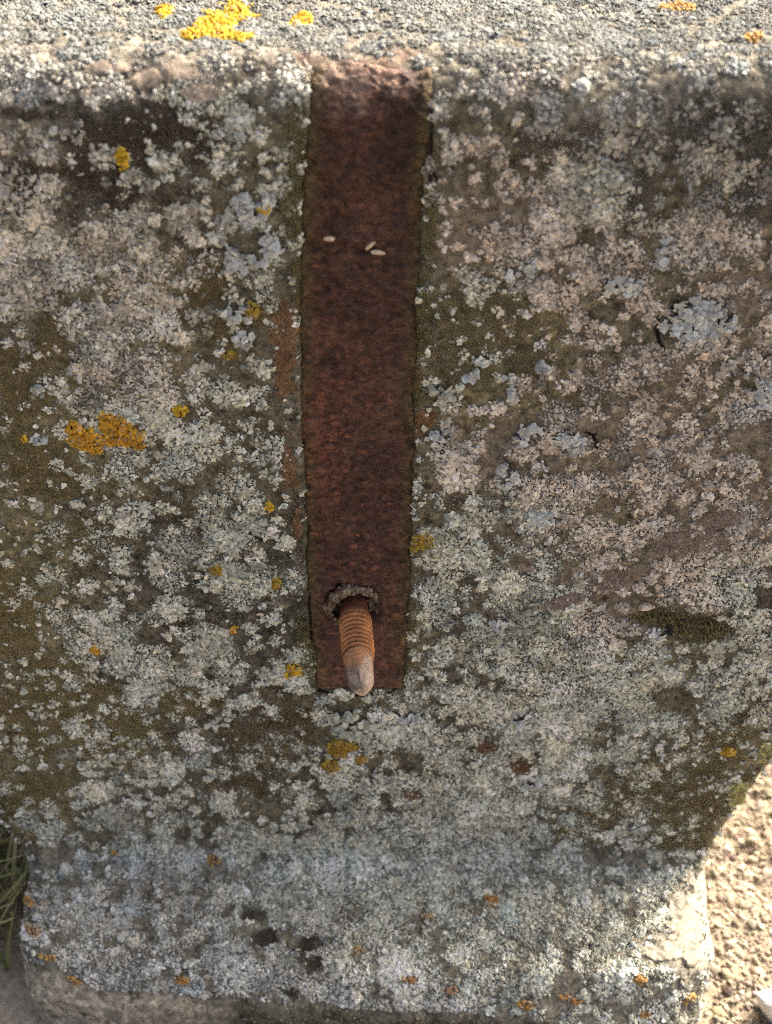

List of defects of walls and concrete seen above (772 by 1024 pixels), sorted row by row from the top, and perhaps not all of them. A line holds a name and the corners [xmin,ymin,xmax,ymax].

rust [345,45,420,70]
rust [415,410,436,437]